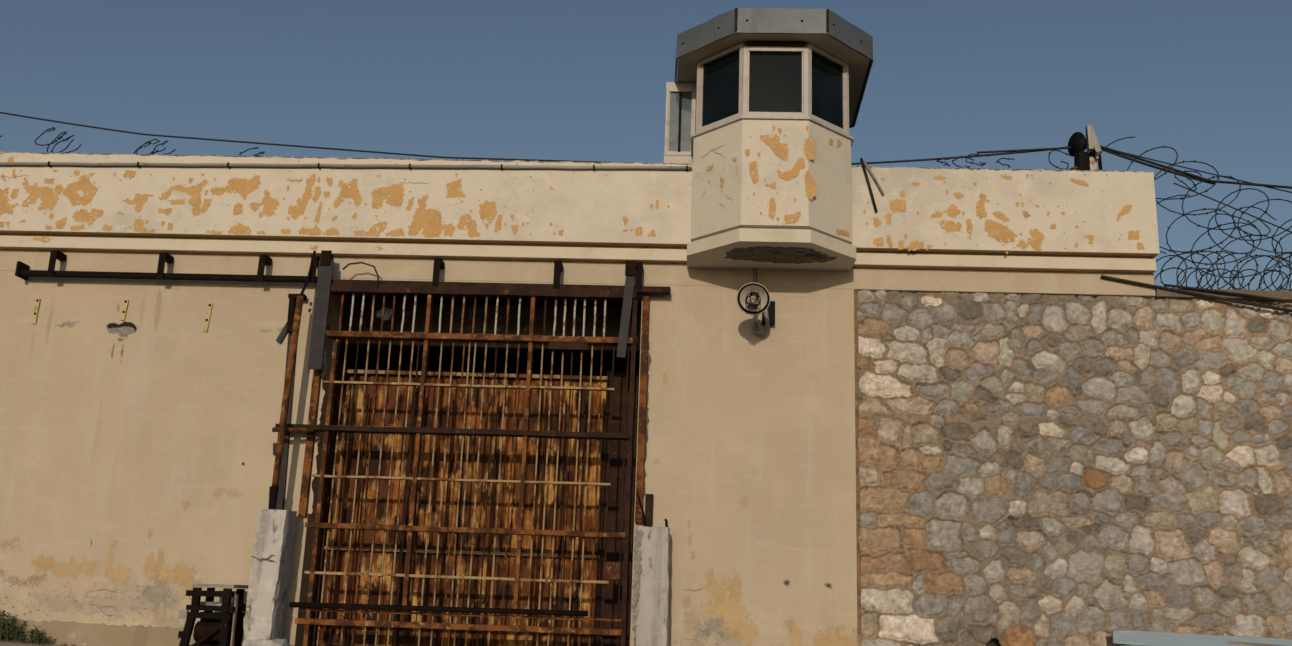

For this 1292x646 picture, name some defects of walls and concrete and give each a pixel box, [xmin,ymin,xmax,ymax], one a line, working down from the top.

peeling [0,152,529,250]
peeling [623,216,656,237]
peeling [703,125,842,224]
peeling [863,175,1065,254]
peeling [1116,205,1145,249]
spalling [106,322,137,341]
damp [32,527,204,646]